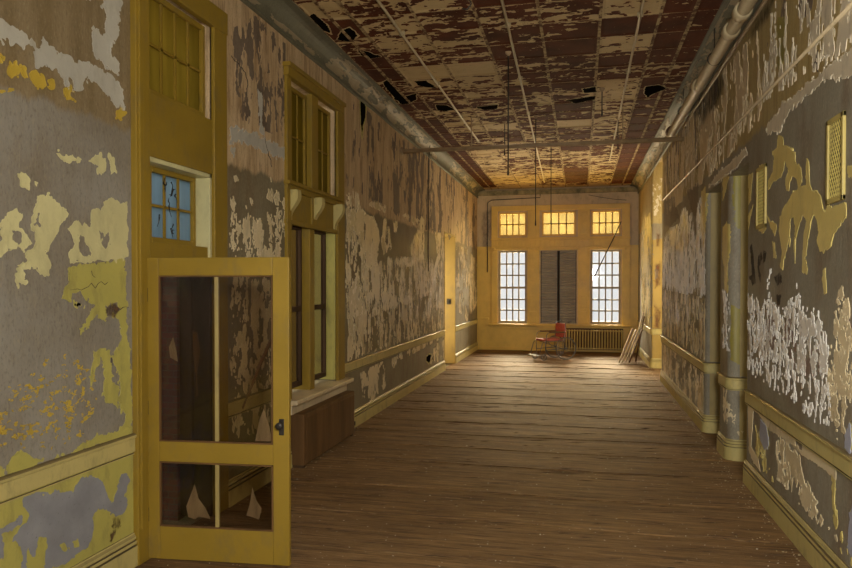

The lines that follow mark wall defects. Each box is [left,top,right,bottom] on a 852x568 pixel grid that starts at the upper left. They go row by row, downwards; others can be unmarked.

peeling [0,0,127,121]
flaking render [229,13,318,161]
peeling [56,149,117,175]
peeling [229,177,285,257]
peeling [325,53,479,401]
peeling [633,0,852,454]
peeling [0,172,133,477]
peeling [230,277,271,399]
flaking render [0,472,130,568]
peeling [723,388,852,566]